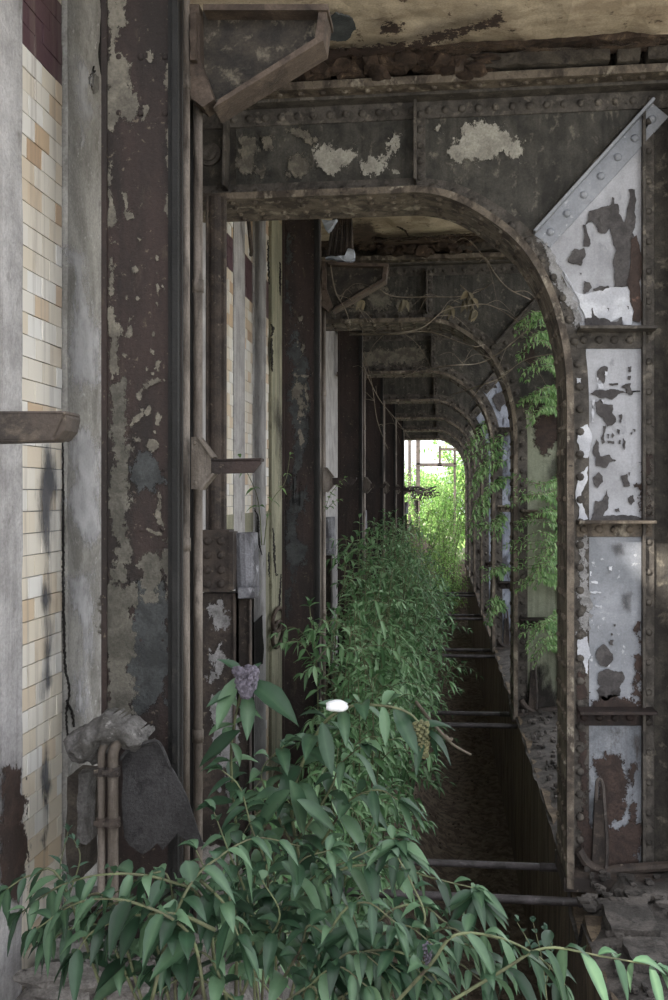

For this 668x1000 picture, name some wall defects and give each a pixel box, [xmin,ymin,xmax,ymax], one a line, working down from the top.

peeling [91,0,158,133]
peeling [284,125,402,181]
peeling [447,118,526,168]
peeling [568,189,636,294]
corrosion [627,235,642,322]
peeling [108,257,168,604]
peeling [575,366,642,520]
damp [40,446,57,556]
damp [43,576,52,689]
peeling [576,624,625,701]
damp [42,751,51,843]
corrosion [590,750,639,829]